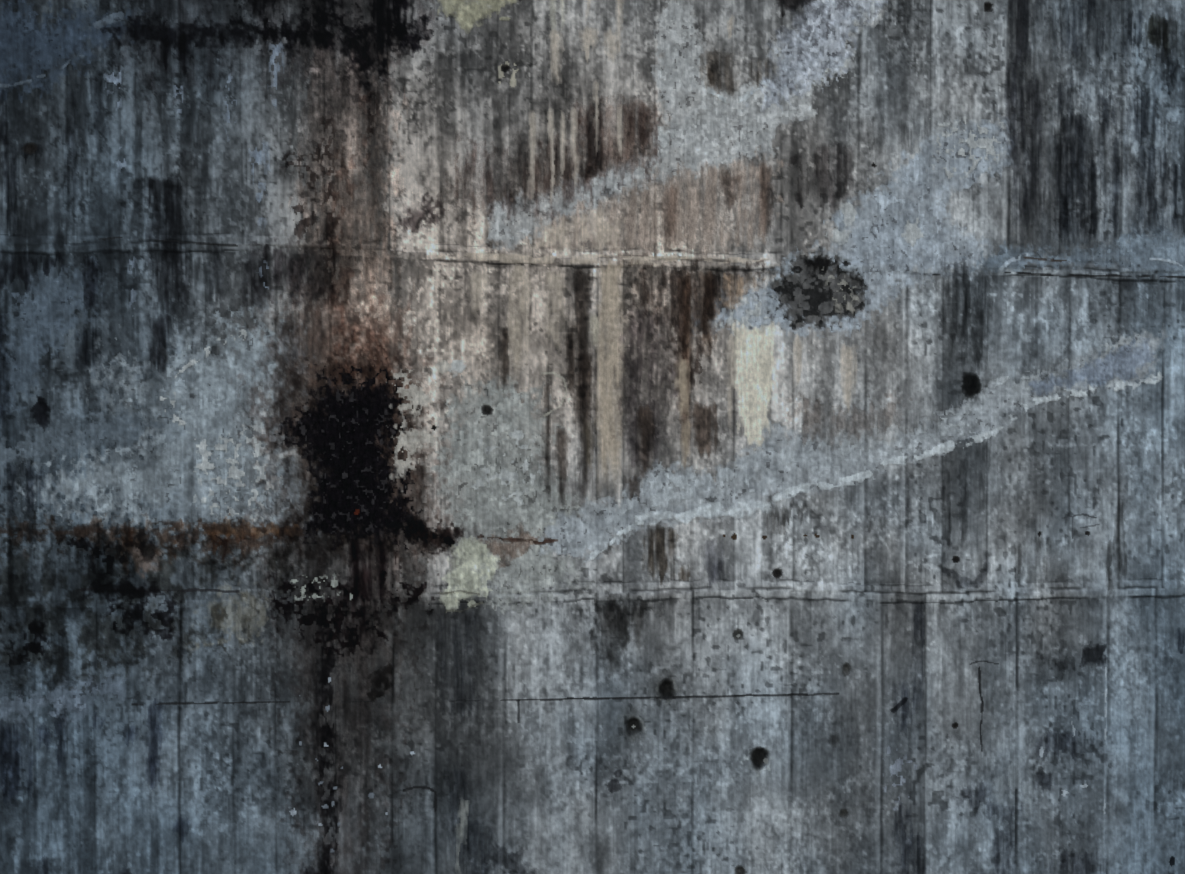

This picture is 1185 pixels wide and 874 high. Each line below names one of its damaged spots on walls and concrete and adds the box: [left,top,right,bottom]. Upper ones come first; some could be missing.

damp [547,0,625,87]
damp [59,0,456,220]
damp [525,106,581,205]
damp [789,139,863,215]
spalling [717,109,1185,345]
damp [941,0,1185,400]
damp [464,208,913,509]
corrosion [0,507,304,563]
damp [0,116,492,874]
corrosion [385,509,559,569]
damp [938,440,992,553]
damp [442,763,543,874]